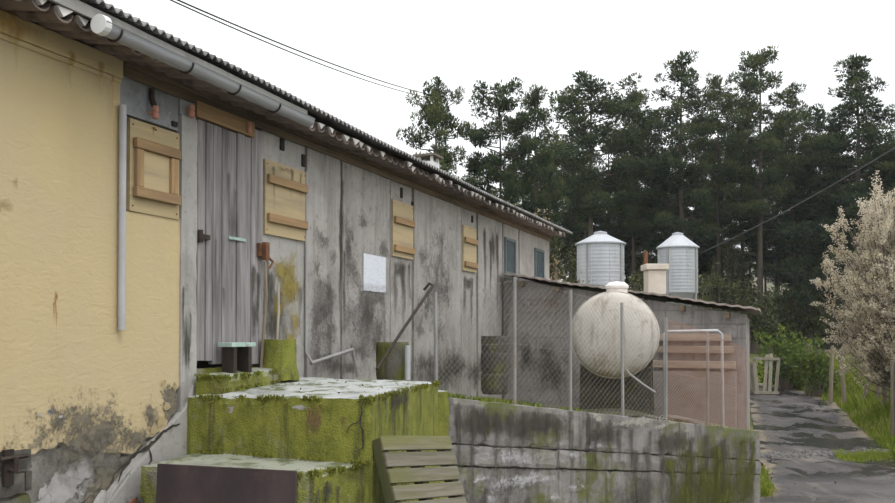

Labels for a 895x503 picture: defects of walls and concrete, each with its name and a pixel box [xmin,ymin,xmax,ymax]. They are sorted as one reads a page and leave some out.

water stain [313,181,385,372]
water stain [395,263,411,304]
water stain [417,356,481,415]
spalling [35,449,132,503]
water stain [22,395,158,474]
crack [81,423,180,503]
water stain [456,403,577,503]